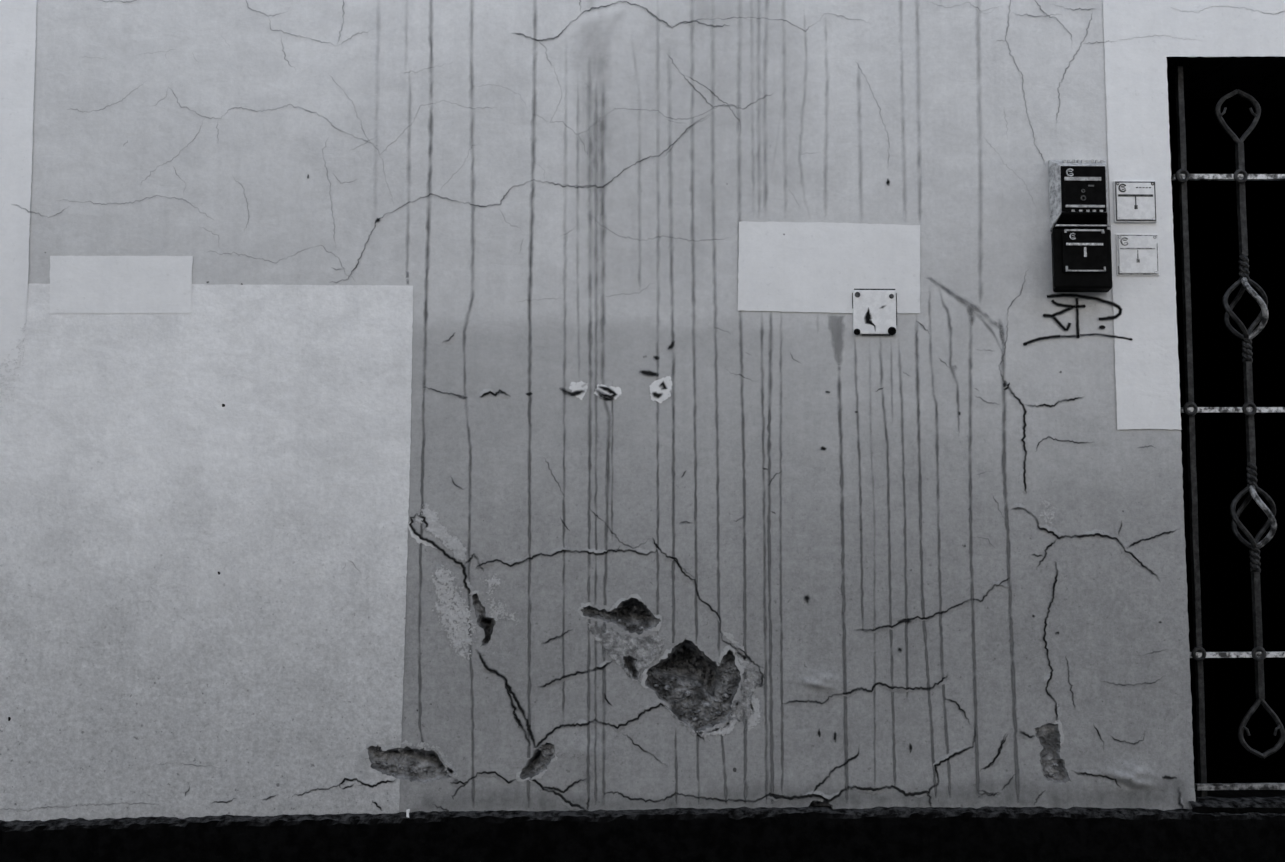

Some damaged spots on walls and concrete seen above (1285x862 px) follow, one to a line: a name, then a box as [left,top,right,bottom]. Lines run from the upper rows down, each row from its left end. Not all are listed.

crack [516,0,733,41]
crack [335,189,510,283]
peeling [415,503,519,660]
flaking render [578,594,764,737]
leakage [761,331,784,798]
crack [408,285,1174,811]
leakage [838,380,848,800]
leakage [857,332,950,795]
leakage [989,326,1019,800]
crack [263,777,396,811]
flaking render [353,739,459,784]
flaking render [1034,720,1071,784]